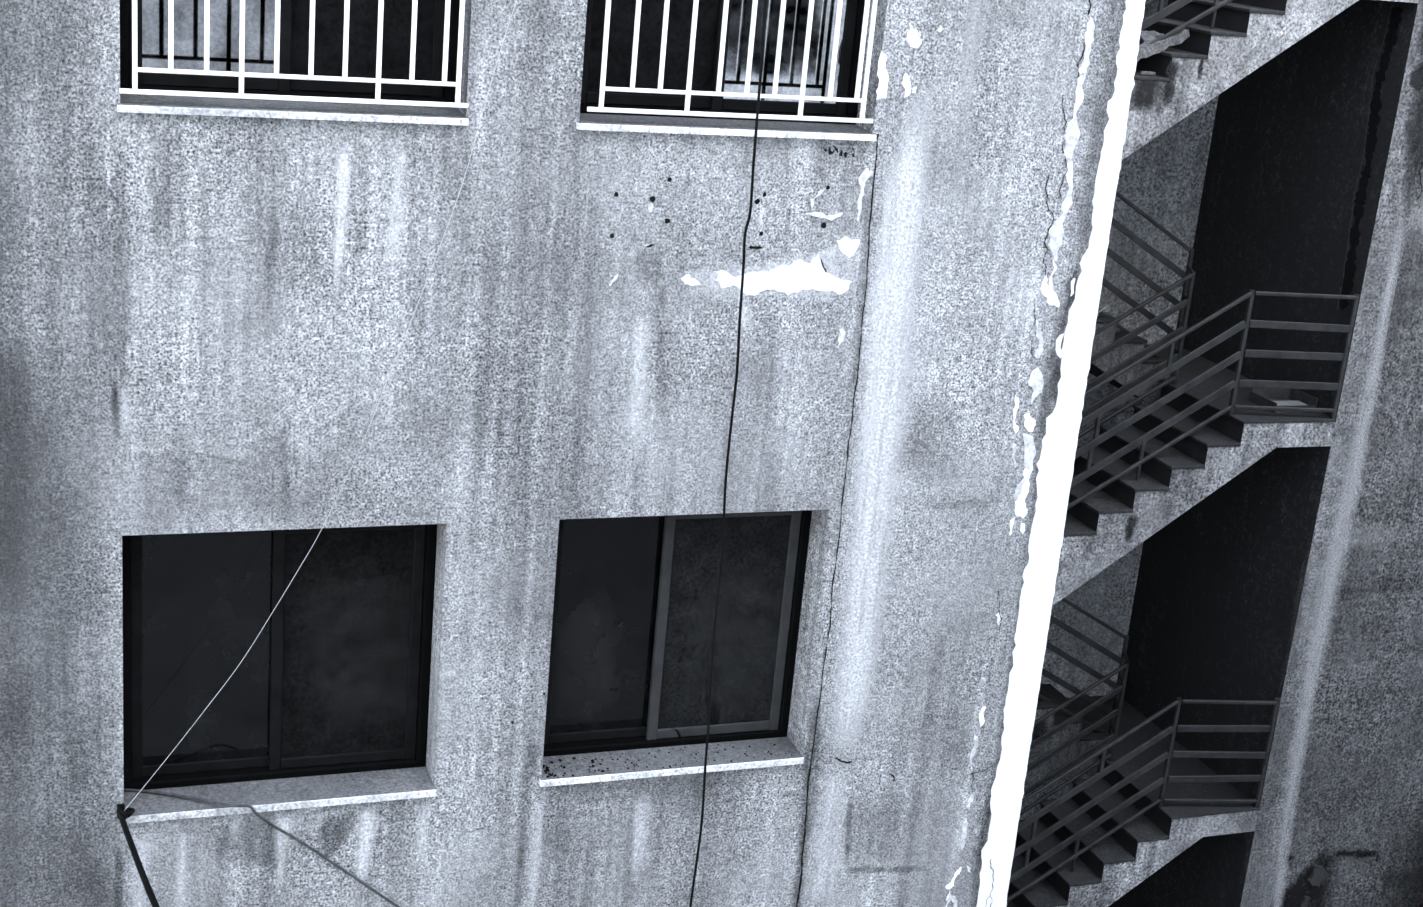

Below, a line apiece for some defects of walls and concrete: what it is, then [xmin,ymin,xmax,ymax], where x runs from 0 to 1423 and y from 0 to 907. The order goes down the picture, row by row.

leakage [335,153,348,266]
crack [1030,0,1092,358]
flaking render [1041,16,1095,308]
crack [796,133,879,907]
flaking render [1009,317,1064,536]
leakage [276,820,289,875]
leakage [323,811,373,876]
flaking render [969,707,986,772]